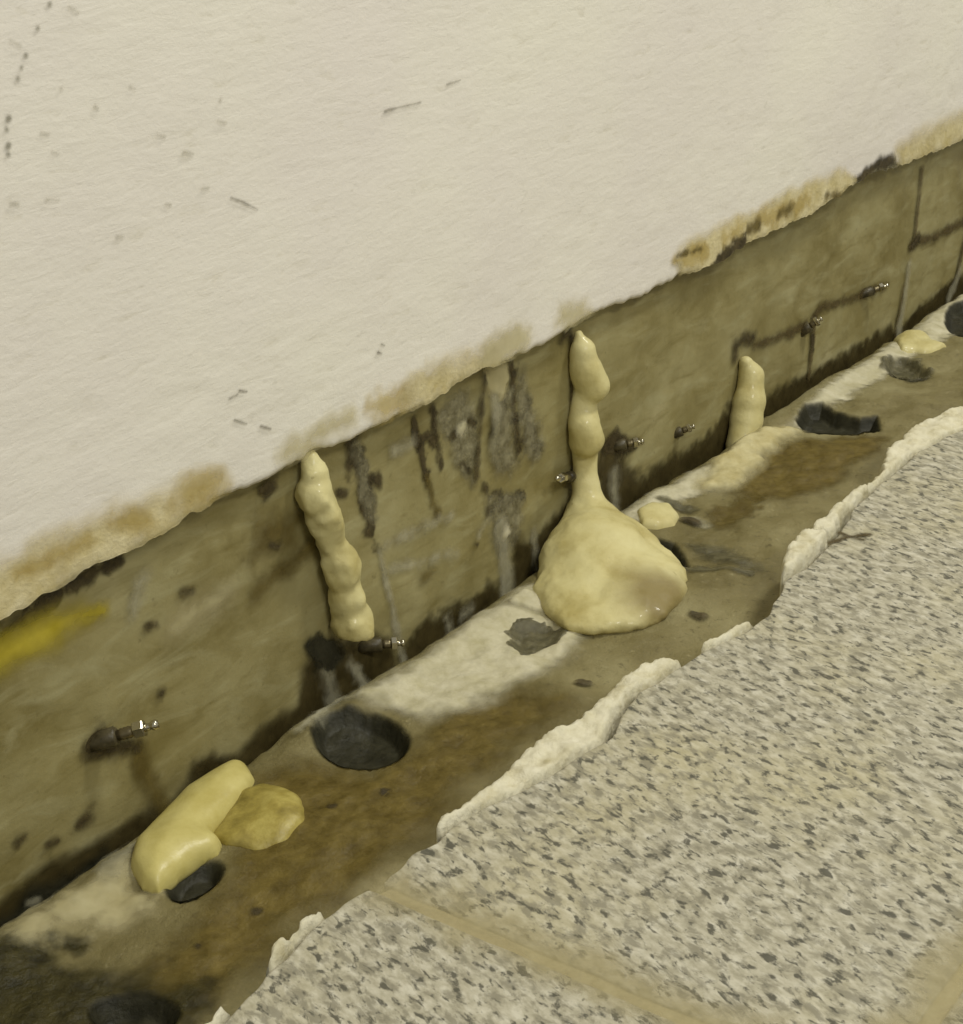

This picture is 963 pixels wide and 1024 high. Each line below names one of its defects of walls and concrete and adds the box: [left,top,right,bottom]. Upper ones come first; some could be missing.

flaking render [676,115,963,272]
water stain [378,327,528,414]
water stain [764,275,963,418]
peeling [0,473,219,620]
flaking render [259,479,277,500]
spalling [336,435,382,537]
spalling [412,359,543,546]
water stain [597,404,886,528]
spalling [779,406,963,597]
spalling [701,622,753,654]
water stain [0,509,580,1024]
spalling [436,658,681,843]